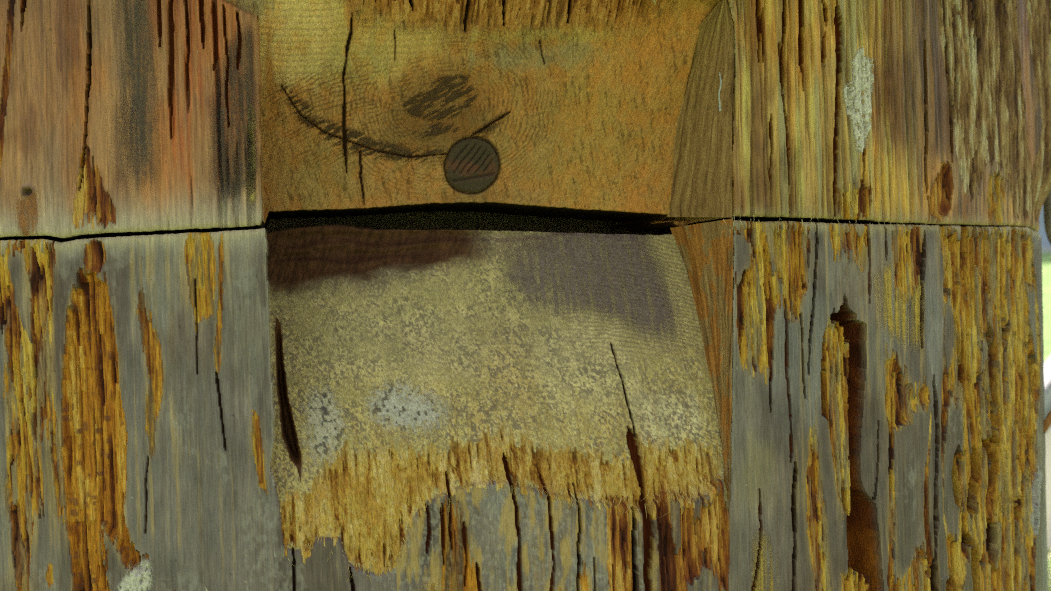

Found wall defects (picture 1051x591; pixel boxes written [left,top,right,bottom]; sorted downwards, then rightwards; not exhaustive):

crack [19,0,27,26]
crack [755,0,828,214]
crack [866,225,888,304]
peeling [45,562,54,589]
crack [290,547,298,591]
crack [425,471,482,591]
crack [502,452,523,591]
crack [537,467,597,591]
crack [609,342,655,591]
crack [751,488,763,591]
crack [769,223,819,591]
spalling [830,294,884,591]